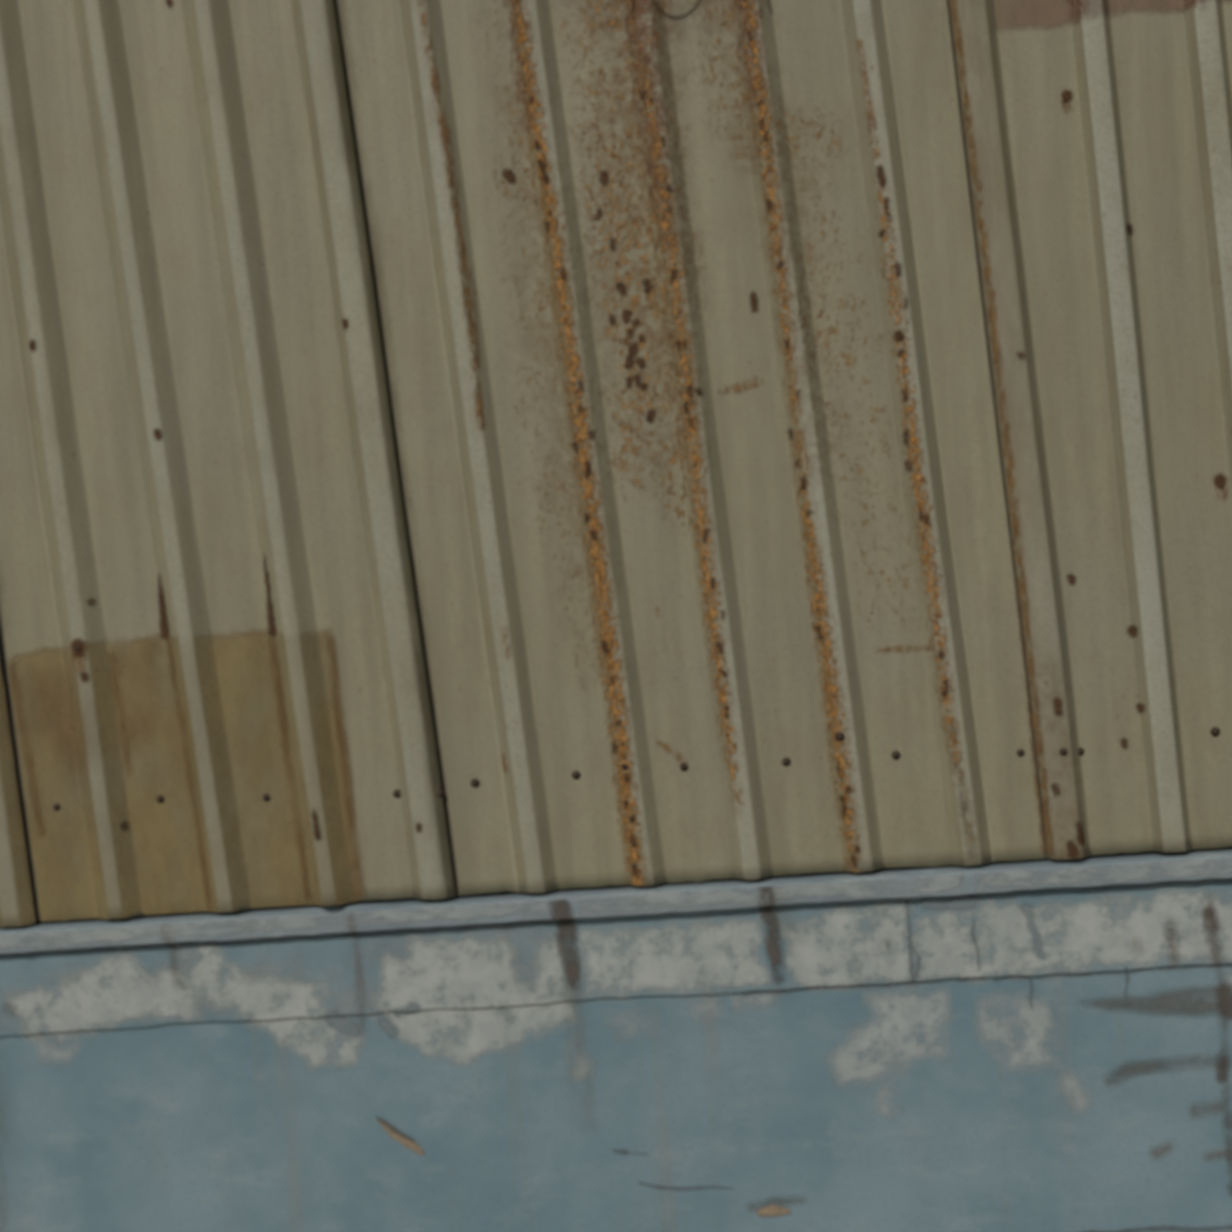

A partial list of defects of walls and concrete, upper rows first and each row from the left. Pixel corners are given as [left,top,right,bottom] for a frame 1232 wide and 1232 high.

rust [500,0,647,886]
rust [579,0,744,810]
rust [704,0,963,872]
rust [951,0,1060,852]
leakage [0,638,218,925]
leakage [197,633,321,907]
peeling [0,900,550,1066]
leakage [304,637,359,905]
peeling [374,920,778,1064]
peeling [578,857,1232,1083]
rust [1067,822,1084,858]
leakage [1095,986,1232,1017]